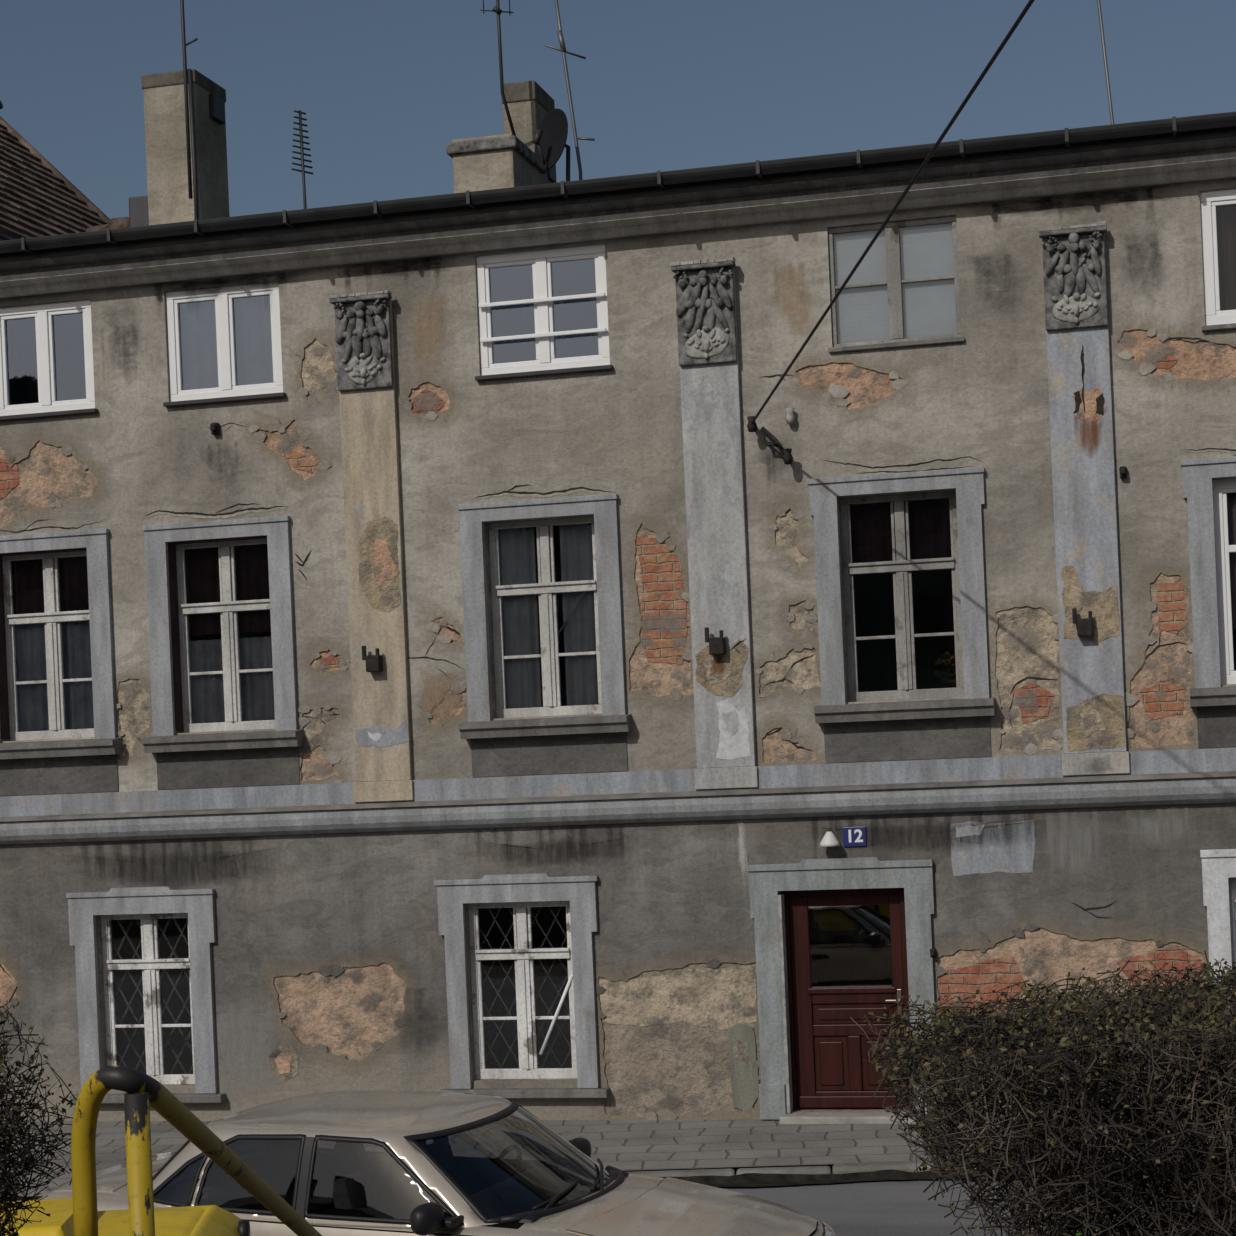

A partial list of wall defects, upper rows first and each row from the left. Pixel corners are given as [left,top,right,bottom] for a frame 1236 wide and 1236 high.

flaking render [794,358,910,412]
crack [1078,344,1086,412]
flaking render [1114,325,1236,385]
flaking render [0,436,100,528]
crack [144,503,289,519]
crack [470,484,616,502]
rust [1082,423,1098,452]
flaking render [624,522,821,766]
flaking render [990,565,1197,755]
flaking render [271,959,409,1064]
flaking render [595,958,761,1120]
flaking render [933,923,1208,1033]